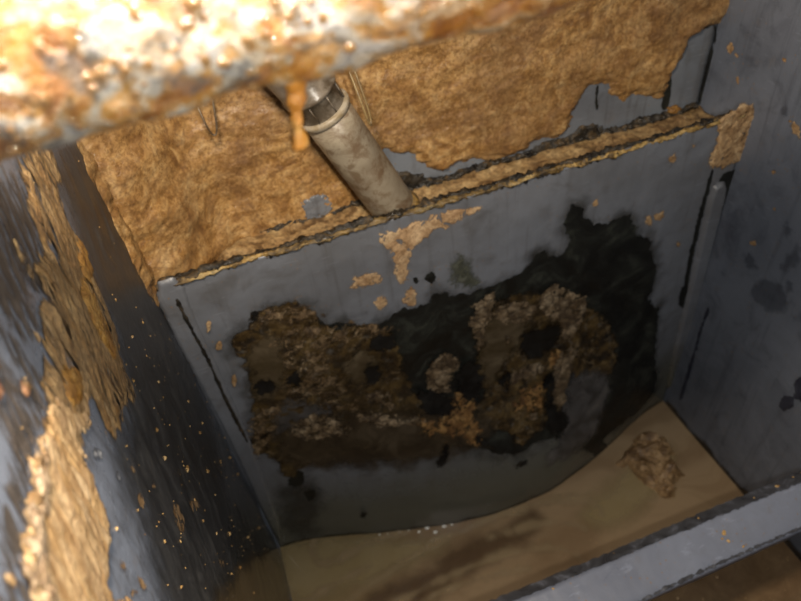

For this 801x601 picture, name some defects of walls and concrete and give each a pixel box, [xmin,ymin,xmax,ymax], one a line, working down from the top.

rust [0,0,591,446]
peeling [0,155,132,601]
peeling [251,299,326,330]
peeling [246,396,359,456]
spalling [326,320,397,353]
water stain [58,143,749,601]
spalling [416,291,610,467]
water stain [779,377,801,411]